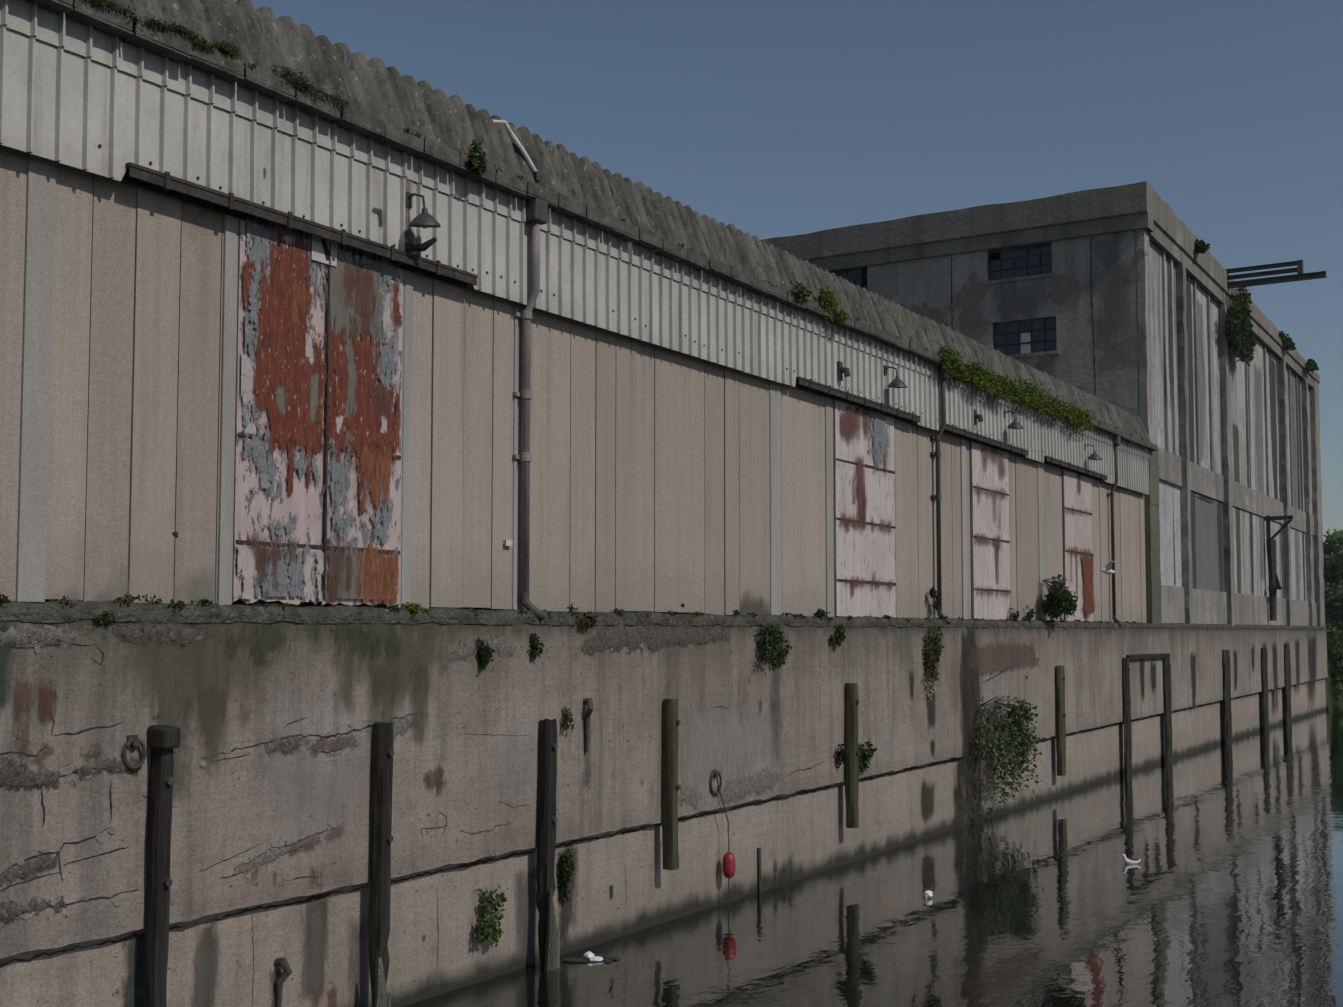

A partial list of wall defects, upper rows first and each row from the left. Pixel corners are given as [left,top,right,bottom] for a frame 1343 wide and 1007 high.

peeling [238,216,402,602]
rust [252,229,400,515]
rust [251,533,295,587]
rust [328,541,399,604]
rust [841,456,892,534]
rust [846,571,893,596]
rust [975,445,1009,597]
rust [1068,548,1095,618]
damp [413,669,427,739]
crack [0,679,1323,1004]